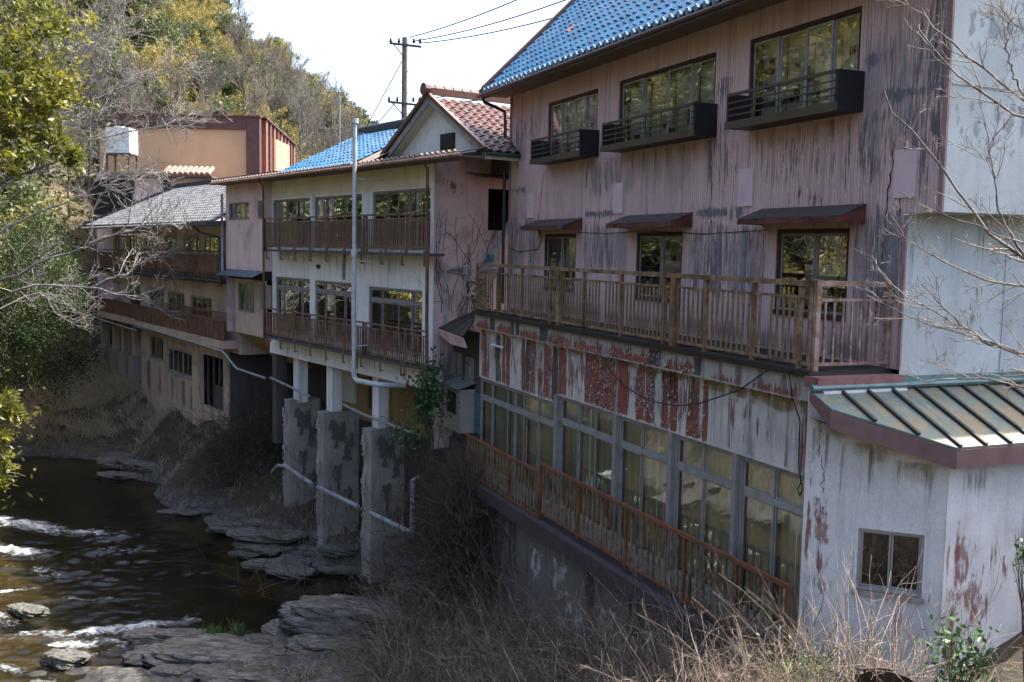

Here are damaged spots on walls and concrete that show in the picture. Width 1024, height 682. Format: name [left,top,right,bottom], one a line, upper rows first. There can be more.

crack [875,110,908,320]
peeling [476,319,740,442]
leakage [294,408,354,512]
leakage [376,435,404,534]
leakage [529,543,616,632]
rust [805,499,828,591]
rust [941,531,1014,676]